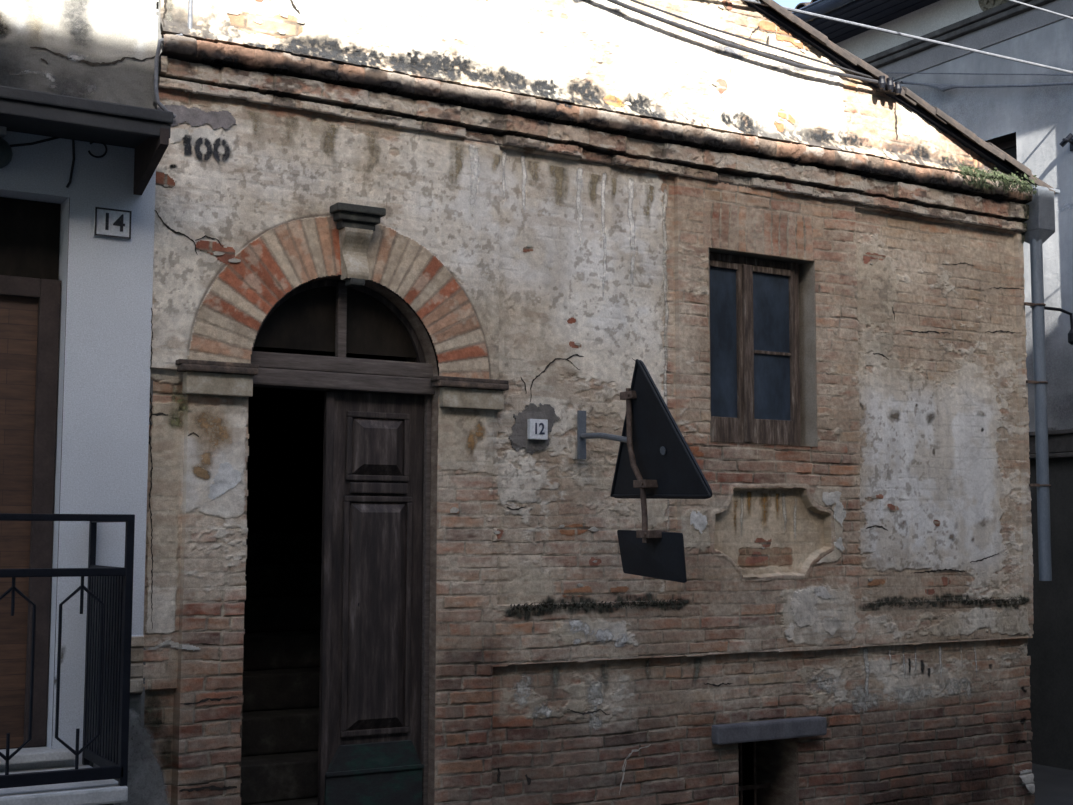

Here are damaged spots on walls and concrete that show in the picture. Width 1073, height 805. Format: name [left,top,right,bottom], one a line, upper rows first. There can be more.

flaking render [759,18,811,53]
crack [30,47,155,66]
damp [199,51,247,72]
flaking render [712,78,728,93]
damp [250,37,841,173]
flaking render [774,108,795,133]
damp [810,130,865,146]
damp [855,157,1009,203]
crack [155,210,223,255]
damp [521,156,635,283]
crack [521,354,584,402]
flaking render [865,494,905,525]